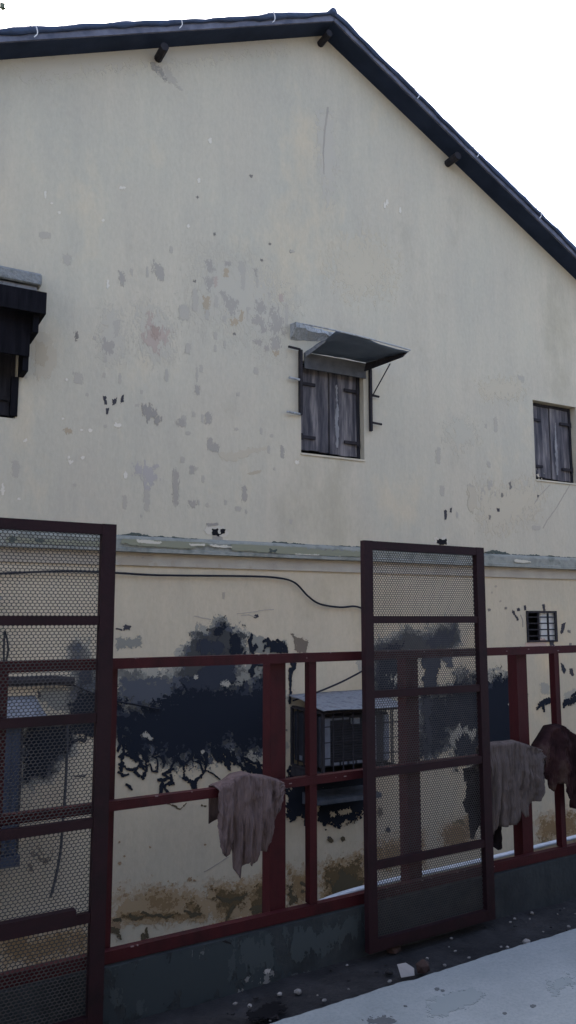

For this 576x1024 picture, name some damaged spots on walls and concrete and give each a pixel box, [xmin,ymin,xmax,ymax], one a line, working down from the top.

peeling [202,259,279,357]
peeling [140,390,162,426]
peeling [123,457,209,518]
water stain [115,614,297,794]
mould [355,613,510,775]